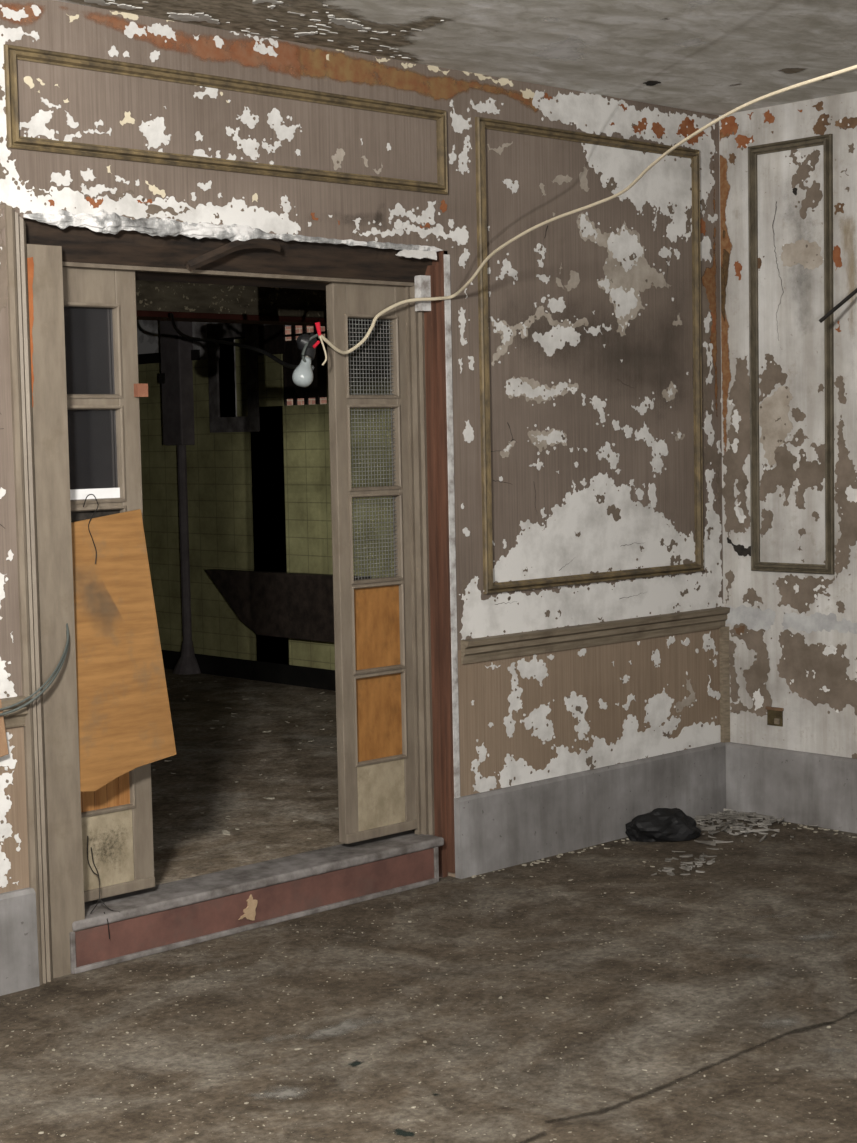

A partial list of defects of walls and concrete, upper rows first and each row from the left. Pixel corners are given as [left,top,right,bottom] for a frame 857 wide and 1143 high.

corrosion [0,4,43,24]
corrosion [87,13,538,112]
peeling [798,101,857,135]
peeling [84,0,775,373]
peeling [785,149,823,220]
peeling [758,238,842,271]
peeling [703,312,713,384]
corrosion [700,155,751,538]
peeling [0,573,8,620]
peeling [459,353,857,793]
peeling [0,657,17,699]
peeling [0,732,21,888]